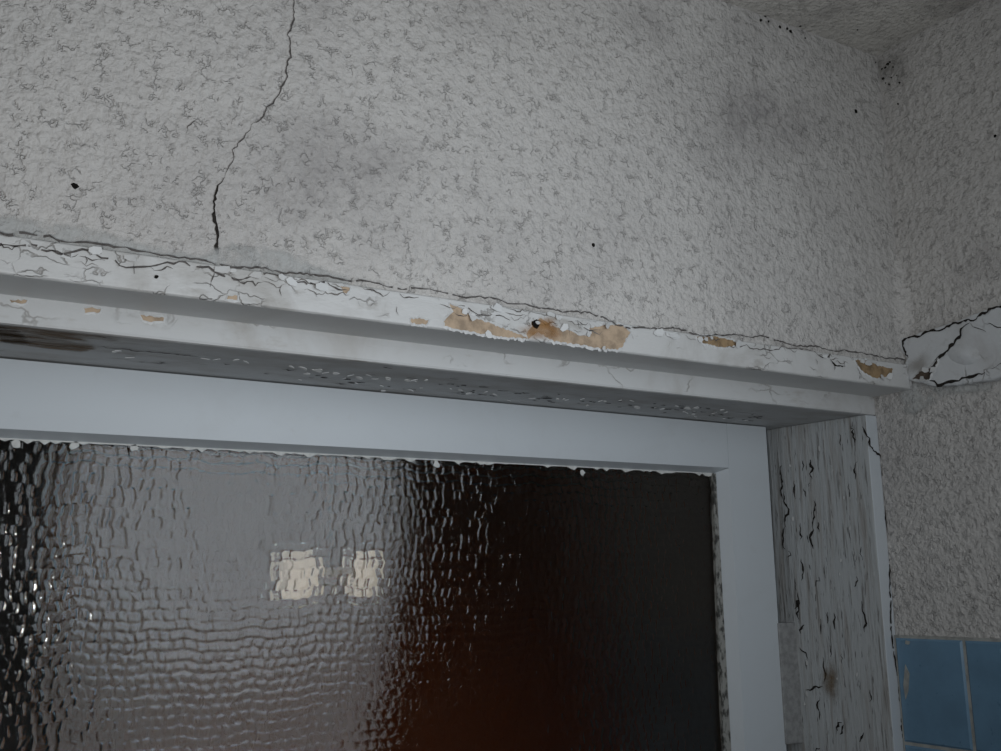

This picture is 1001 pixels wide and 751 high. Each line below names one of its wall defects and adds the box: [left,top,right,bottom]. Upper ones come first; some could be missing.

crack [0,1,1001,387]
damp [0,326,93,352]
peeling [408,302,632,353]
peeling [854,358,893,380]
crack [863,428,888,533]
crack [889,560,900,701]